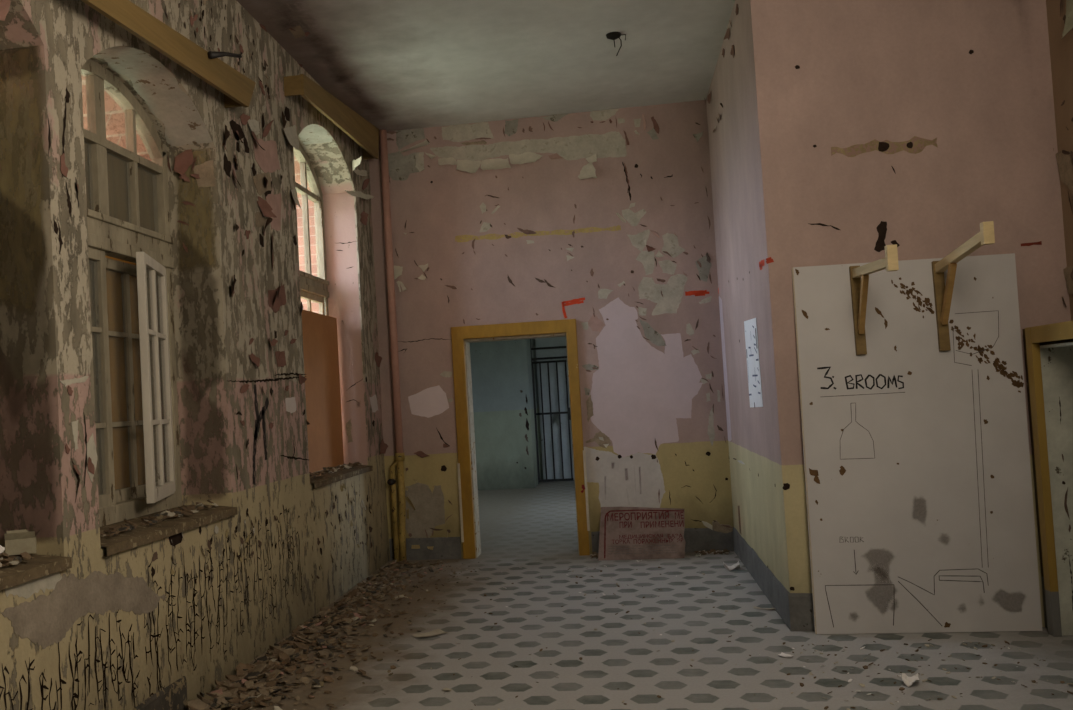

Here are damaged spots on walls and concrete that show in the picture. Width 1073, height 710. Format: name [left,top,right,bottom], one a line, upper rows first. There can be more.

peeling [0,0,11,21]
peeling [1060,0,1073,38]
leakage [0,46,44,312]
leakage [178,150,215,269]
peeling [1053,148,1073,214]
peeling [581,202,712,349]
flaking render [584,431,665,508]
peeling [169,505,291,584]
peeling [311,484,373,579]